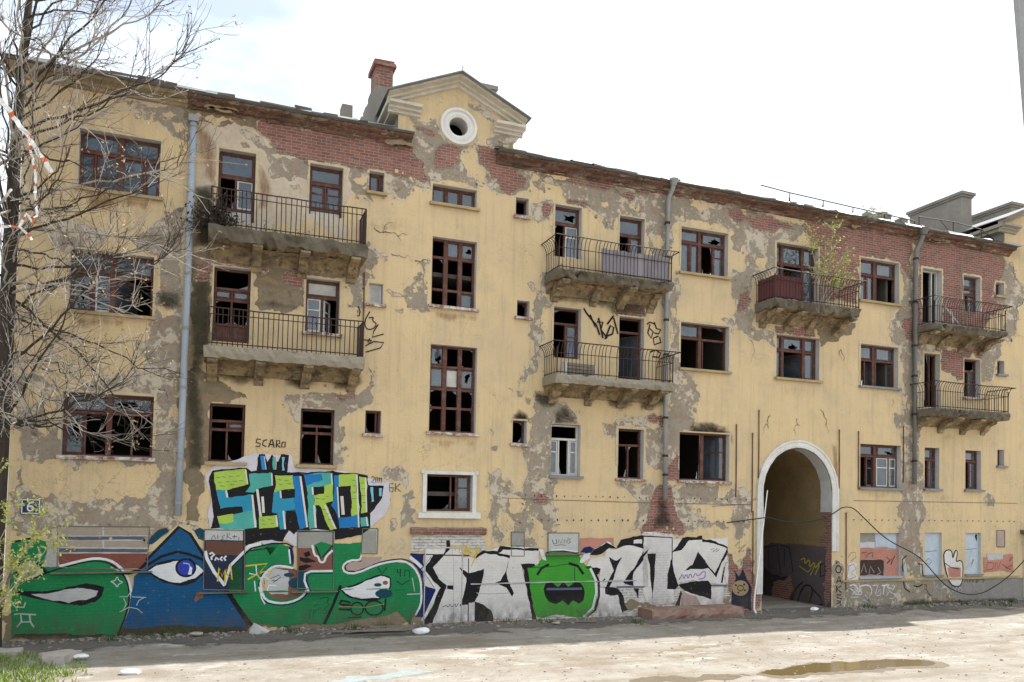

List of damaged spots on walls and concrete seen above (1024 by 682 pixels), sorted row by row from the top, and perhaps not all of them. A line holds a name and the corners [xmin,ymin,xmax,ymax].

mould [195,188,214,245]
damp [189,281,211,467]
flaking render [8,98,1024,611]